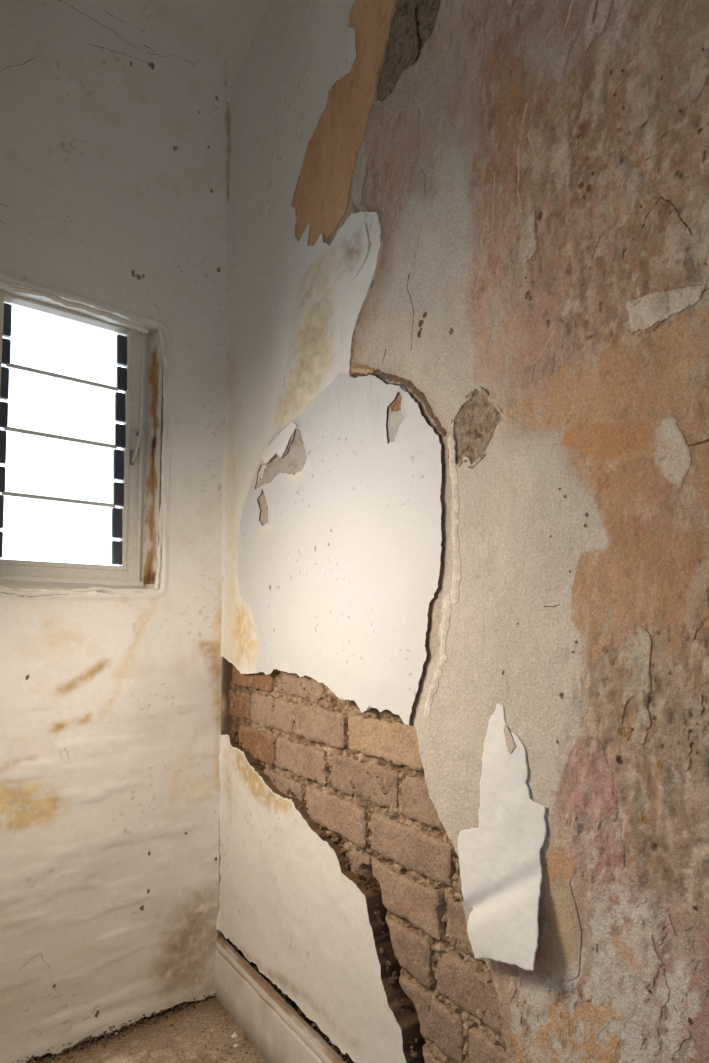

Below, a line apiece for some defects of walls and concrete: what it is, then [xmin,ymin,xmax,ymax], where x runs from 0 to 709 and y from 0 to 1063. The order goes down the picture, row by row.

crack [58,0,203,75]
corrosion [142,340,163,584]
peeling [229,0,709,1063]
leakage [34,589,168,738]
leakage [0,750,75,841]
leakage [142,871,363,1061]
leakage [99,1051,133,1063]